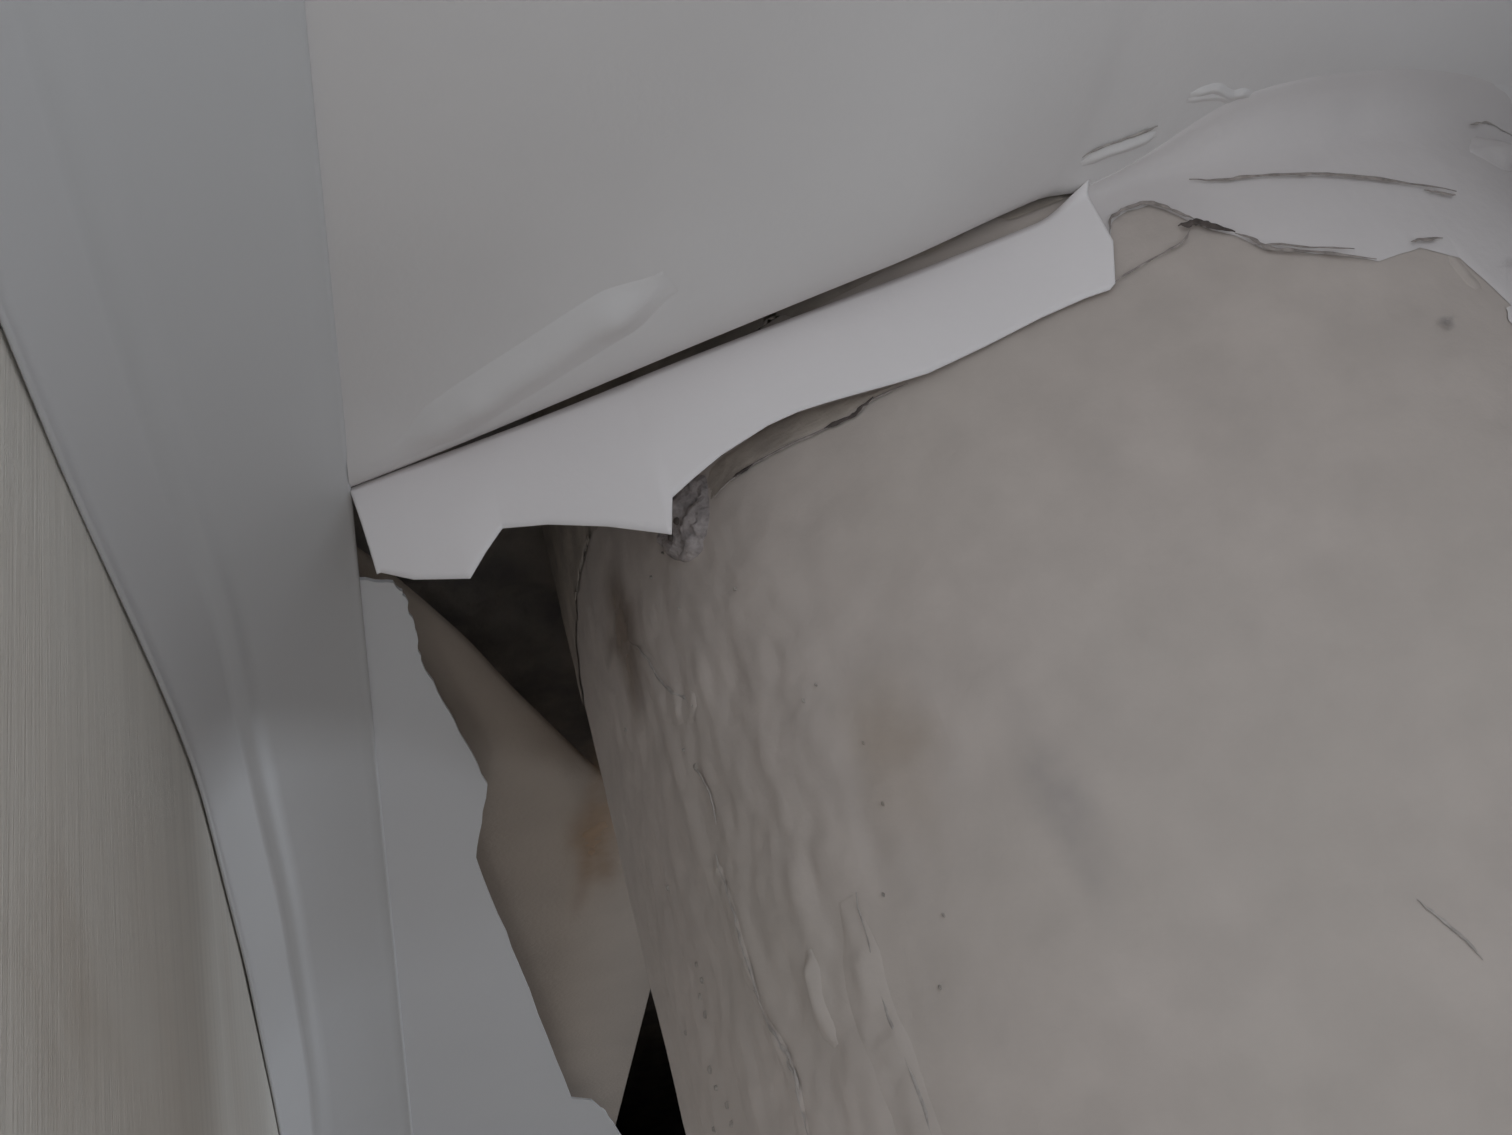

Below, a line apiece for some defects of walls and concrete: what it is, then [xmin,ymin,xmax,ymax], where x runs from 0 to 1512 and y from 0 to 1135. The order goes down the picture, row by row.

peeling [350,180,1115,772]
crack [1109,172,1457,282]